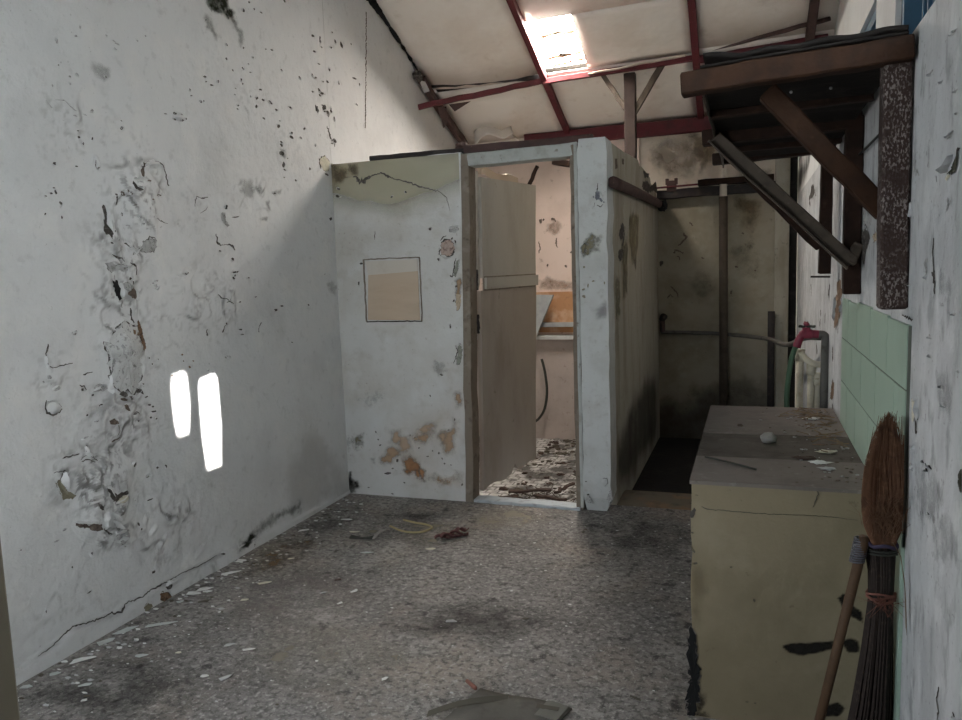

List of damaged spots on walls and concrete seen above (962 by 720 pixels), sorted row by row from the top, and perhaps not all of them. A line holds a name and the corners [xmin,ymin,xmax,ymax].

crack [338,172,450,209]
peeling [936,147,960,181]
peeling [437,225,461,311]
water stain [615,215,639,317]
peeling [80,254,159,423]
peeling [55,470,154,548]
crack [39,555,217,656]